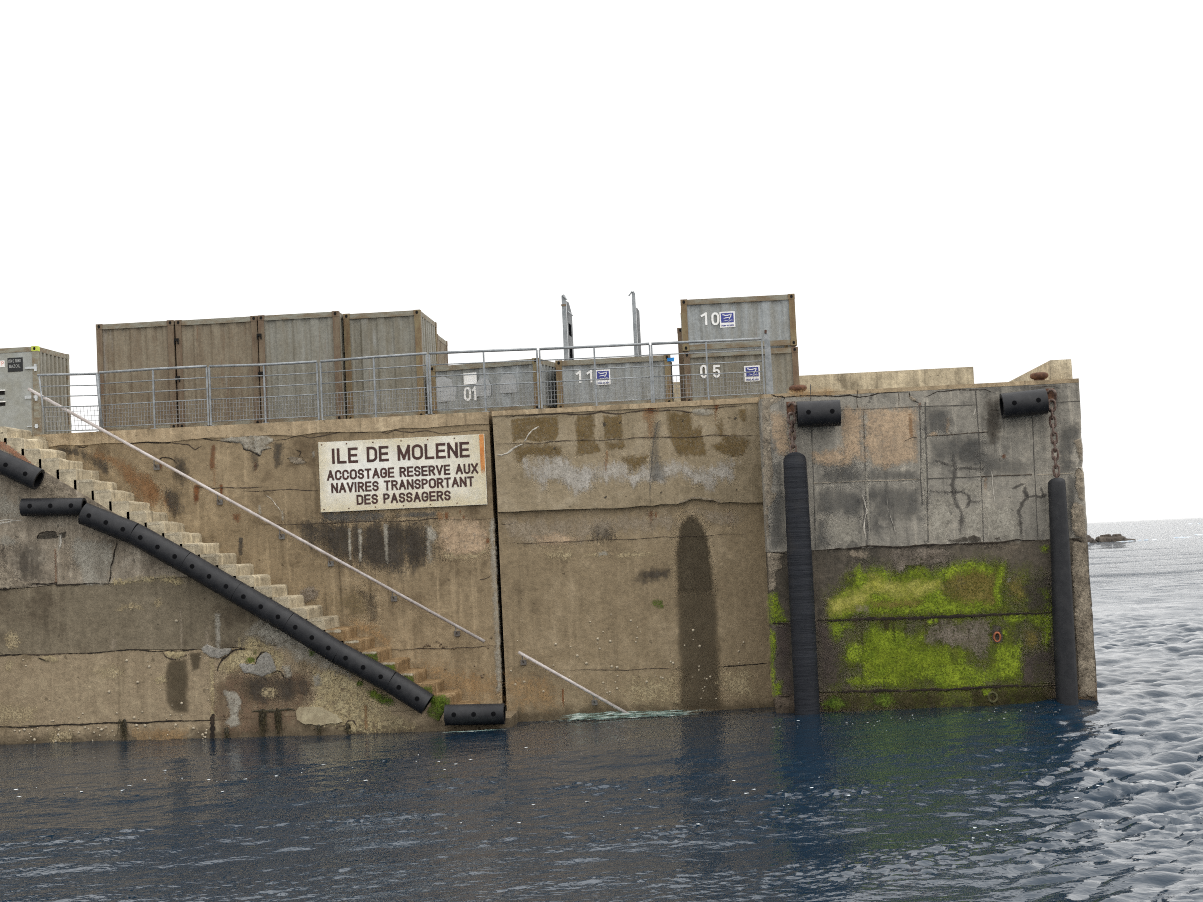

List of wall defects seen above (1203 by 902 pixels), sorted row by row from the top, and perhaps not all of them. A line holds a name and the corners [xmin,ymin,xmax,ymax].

leakage [511,412,748,495]
leakage [301,512,436,574]
crack [813,460,1083,551]
leakage [167,611,220,711]
peeling [201,622,387,734]